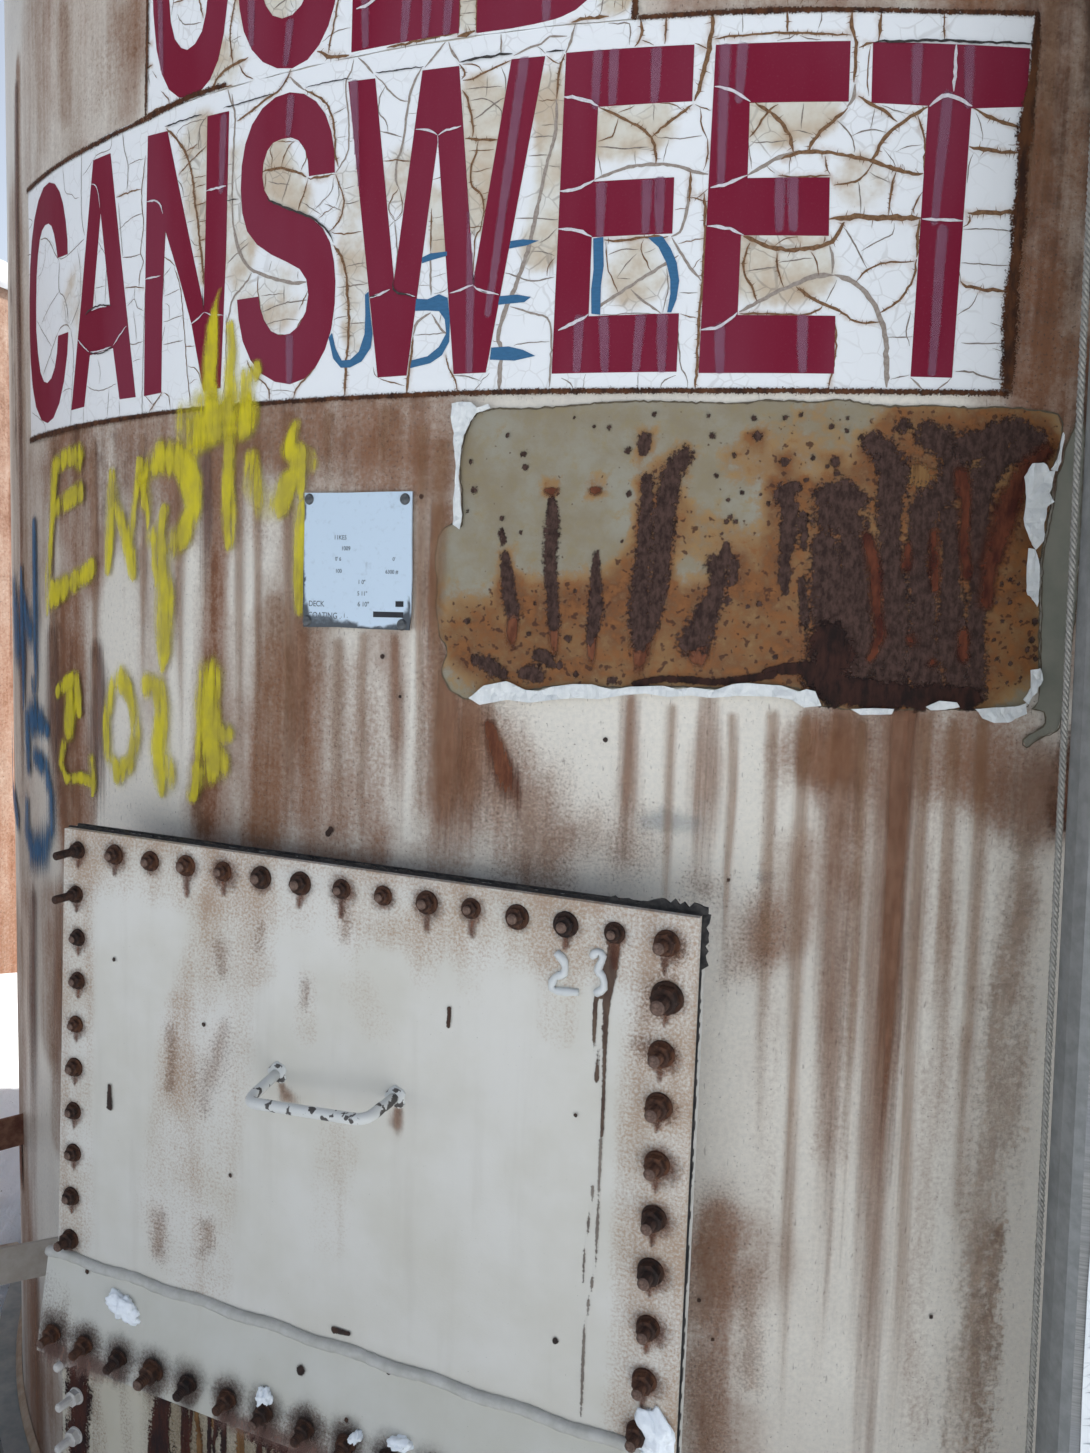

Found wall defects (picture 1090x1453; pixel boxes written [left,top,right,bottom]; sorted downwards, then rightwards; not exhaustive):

crack [27,0,1033,426]
peeling [435,399,1086,748]
corrosion [29,887,37,1087]
corrosion [56,852,86,1042]
corrosion [181,860,238,897]
corrosion [331,876,354,918]
corrosion [802,709,855,1124]
corrosion [865,710,918,1306]
corrosion [1013,732,1071,833]
corrosion [580,931,626,1415]
corrosion [31,1278,127,1453]
corrosion [145,1355,354,1453]